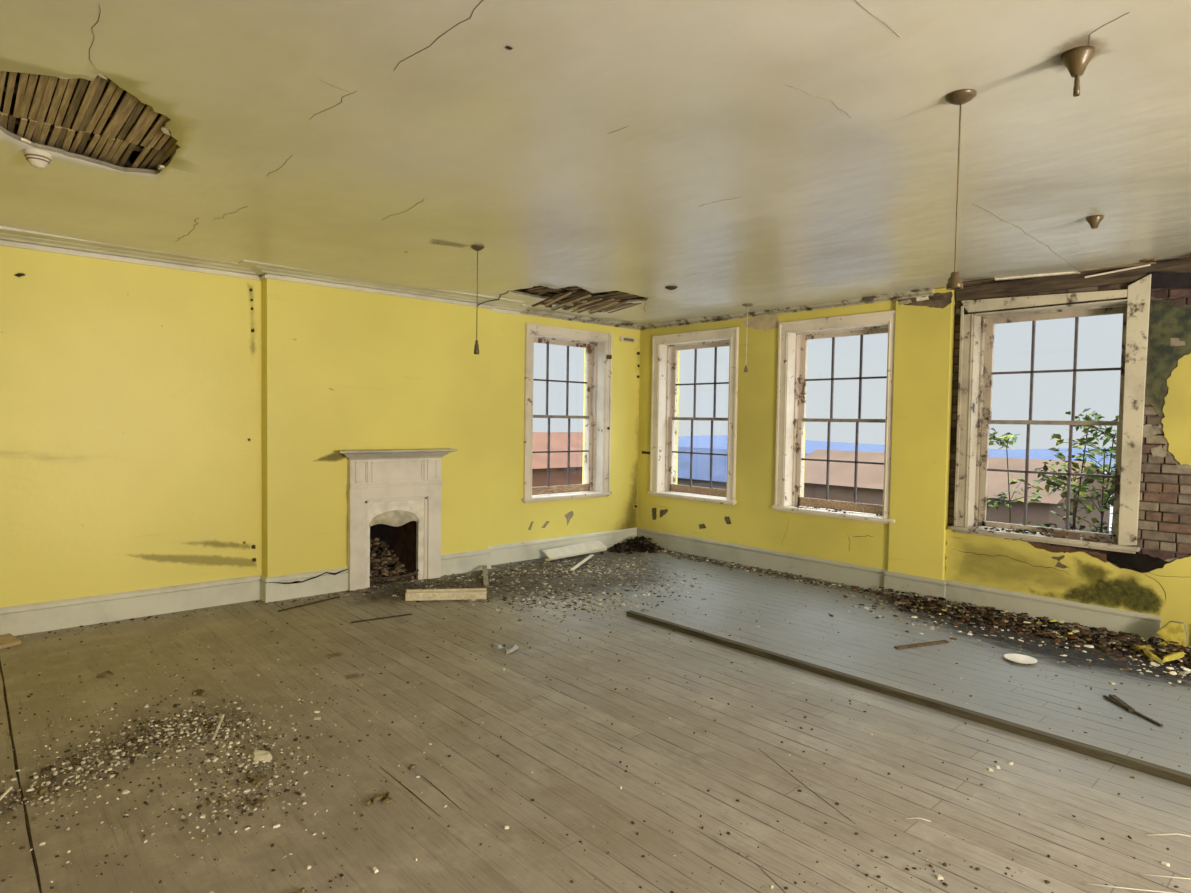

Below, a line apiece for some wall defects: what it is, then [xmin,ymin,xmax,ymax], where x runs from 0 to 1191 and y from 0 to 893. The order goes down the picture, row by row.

crack [89,5,101,69]
crack [395,0,483,69]
crack [313,80,357,116]
spalling [1150,288,1191,306]
damp [1146,300,1191,409]
spalling [1027,397,1191,573]
damp [1065,566,1161,612]